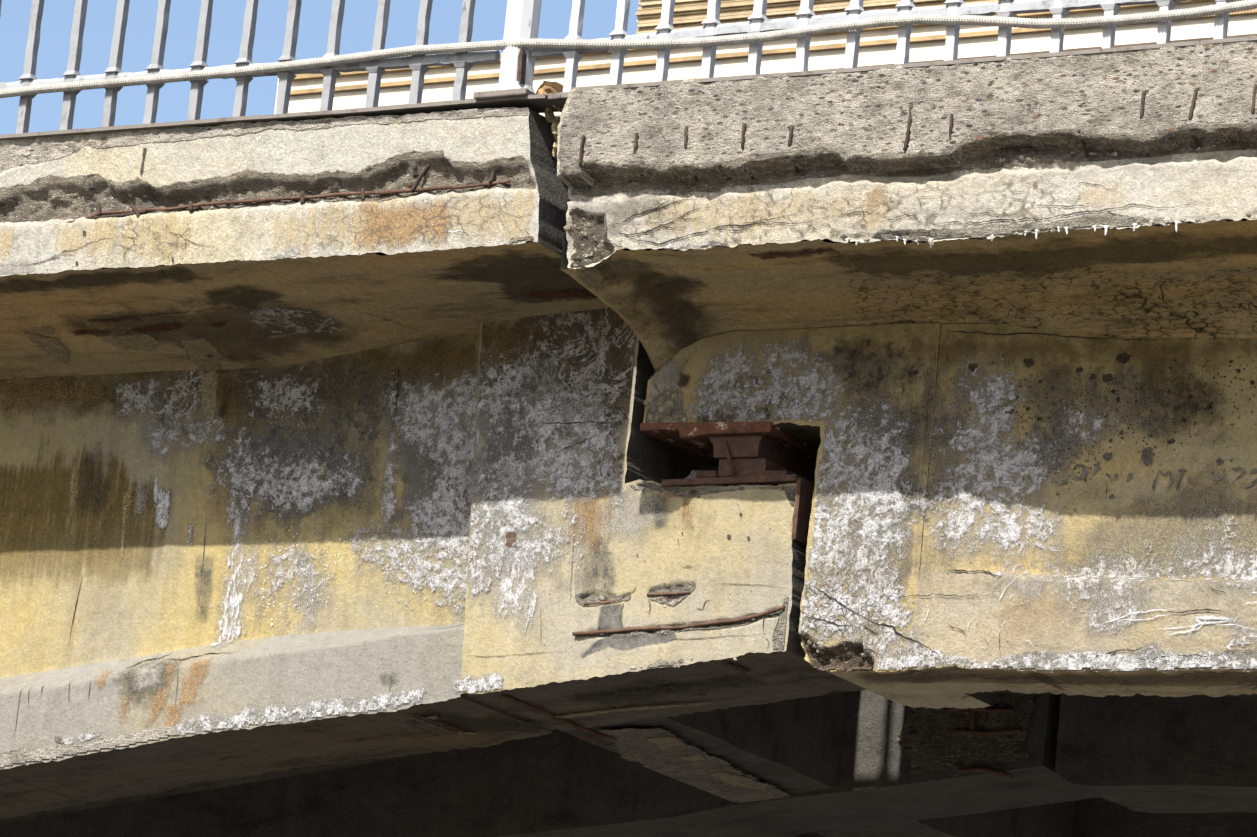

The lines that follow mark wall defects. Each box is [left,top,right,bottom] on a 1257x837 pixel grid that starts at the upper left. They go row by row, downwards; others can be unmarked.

spalling [0,110,535,223]
spalling [558,42,1257,291]
crack [609,179,1202,248]
damp [0,260,33,274]
crack [845,252,1257,341]
damp [0,308,667,646]
spalling [630,481,795,506]
damp [649,336,1257,670]
spalling [572,582,873,671]
crack [1091,587,1257,661]
rust [150,660,208,726]
damp [453,672,503,693]